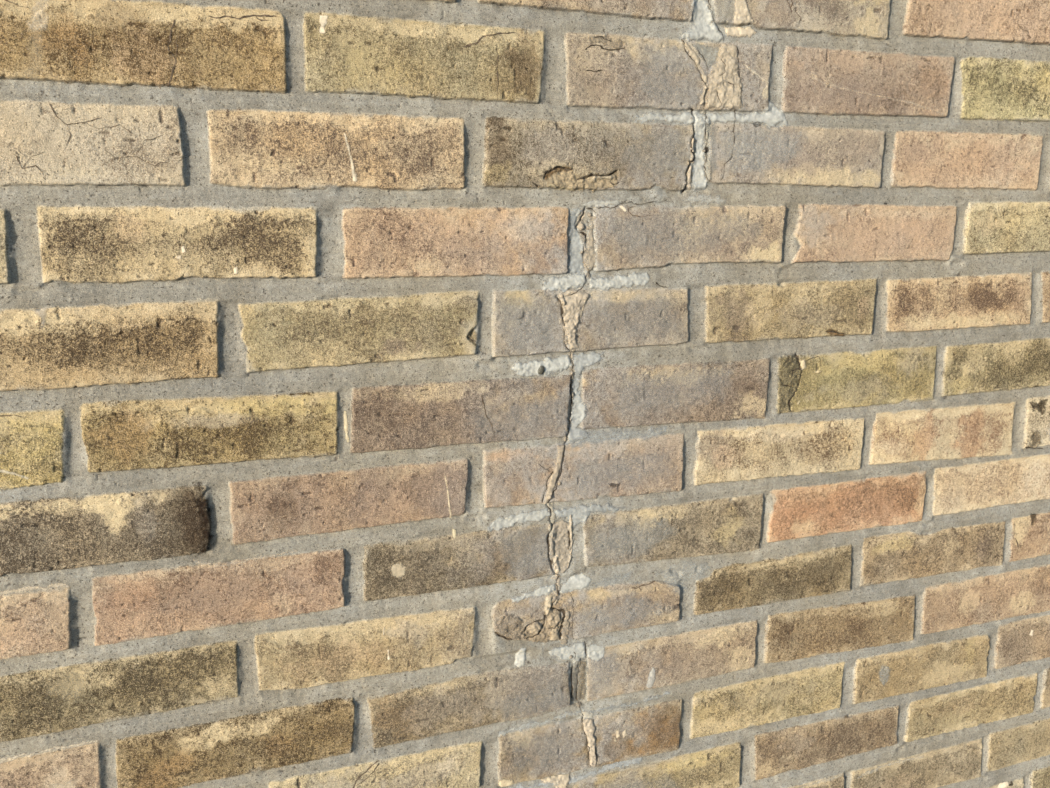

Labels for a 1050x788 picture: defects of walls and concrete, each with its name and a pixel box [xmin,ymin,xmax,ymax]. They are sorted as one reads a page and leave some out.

crack [539,0,742,767]